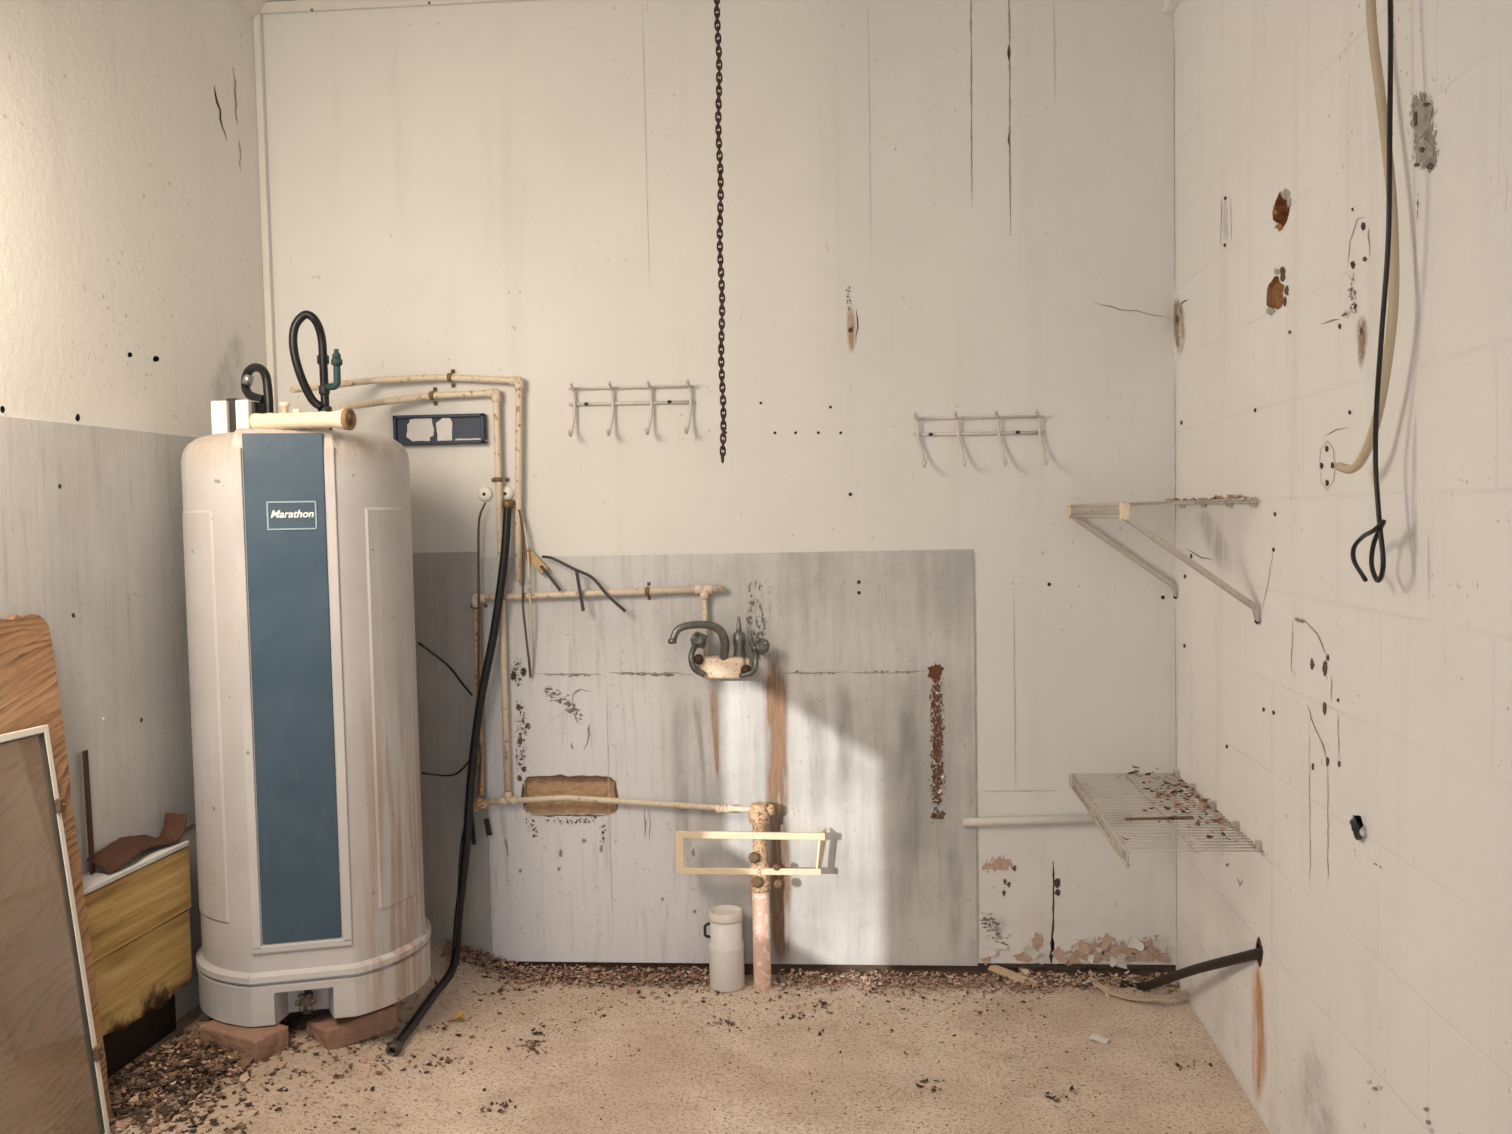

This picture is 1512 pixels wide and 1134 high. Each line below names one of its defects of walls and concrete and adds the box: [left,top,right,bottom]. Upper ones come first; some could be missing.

spalling [1407,92,1440,172]
corrosion [927,662,946,823]
peeling [982,856,1016,896]
spalling [979,913,1172,969]